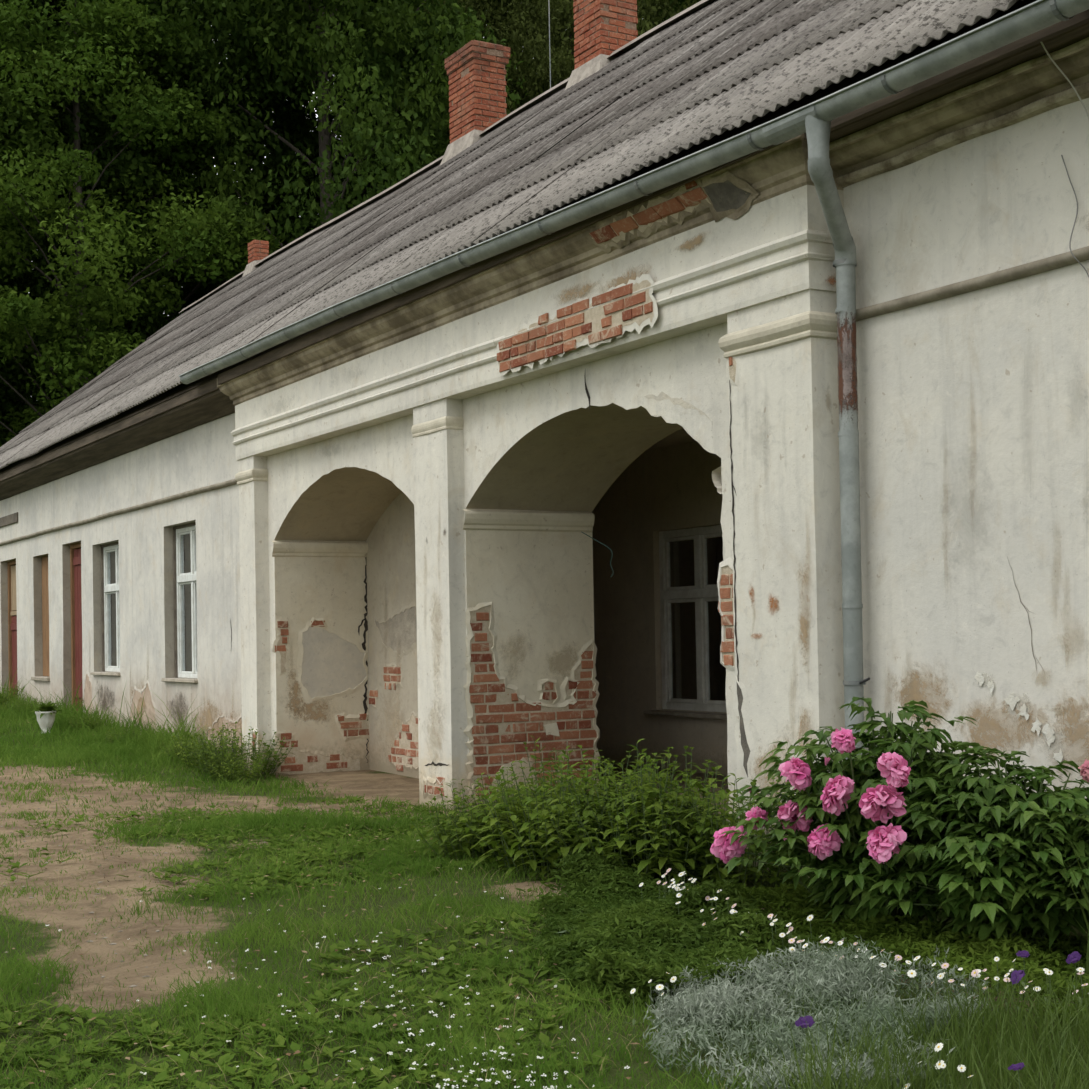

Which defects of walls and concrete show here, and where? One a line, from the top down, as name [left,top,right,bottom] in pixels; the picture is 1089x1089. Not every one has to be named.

spalling [589,170,759,253]
spalling [497,274,658,375]
corrosion [837,313,858,423]
flaking render [272,601,417,775]
crack [358,557,369,763]
spalling [463,601,600,805]
spalling [717,557,756,785]
leakage [900,672,949,729]
leakage [969,704,1039,755]
crack [1008,560,1044,671]
peeling [1004,692,1065,764]
leakage [1059,697,1089,764]